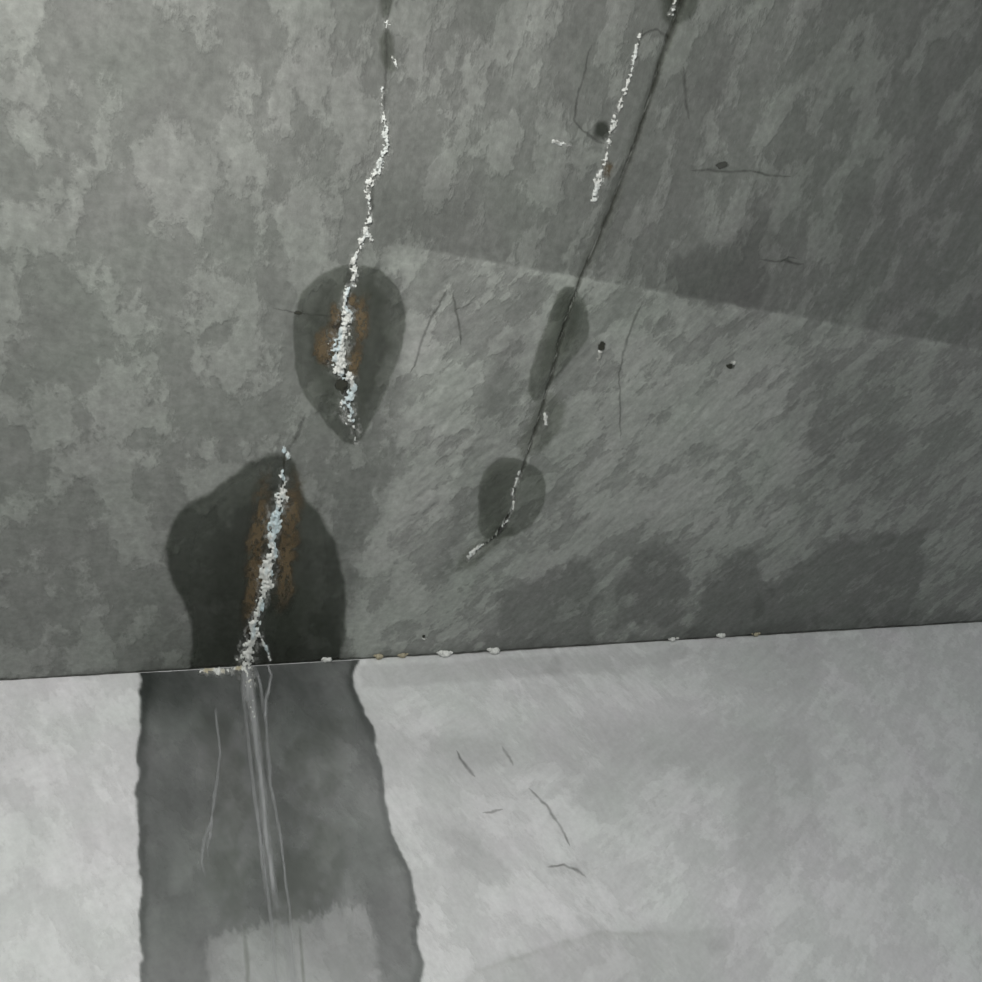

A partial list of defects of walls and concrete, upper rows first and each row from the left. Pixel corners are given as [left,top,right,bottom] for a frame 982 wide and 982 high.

crack [629,0,682,158]
rust [315,295,368,376]
rust [244,493,269,620]
rust [278,487,299,598]
water stain [136,445,377,945]